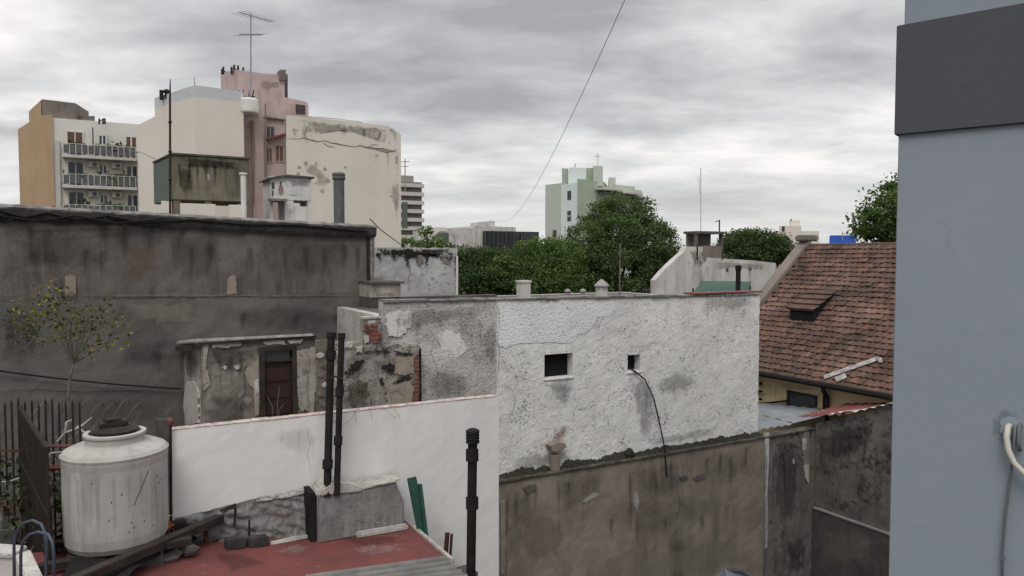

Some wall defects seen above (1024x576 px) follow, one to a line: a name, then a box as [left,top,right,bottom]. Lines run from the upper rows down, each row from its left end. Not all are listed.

crack [287,137,397,153]
water stain [376,248,456,282]
spalling [336,310,413,357]
spalling [436,330,467,358]
peeling [183,343,242,425]
peeling [223,338,316,416]
peeling [384,355,420,405]